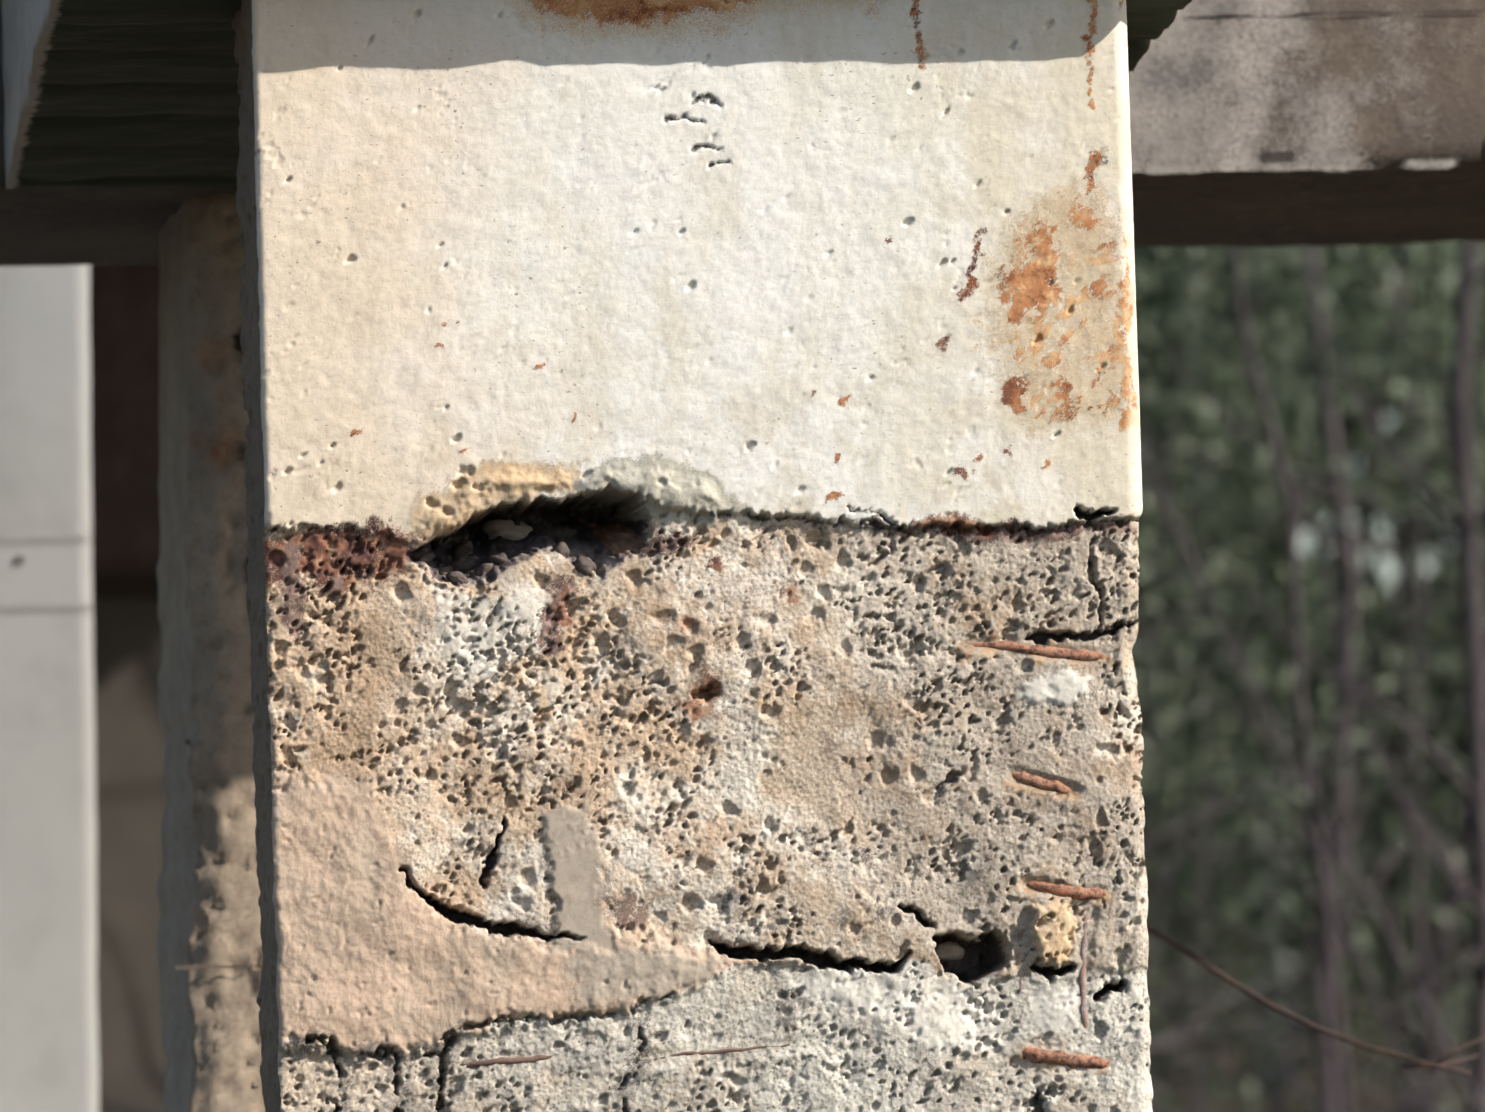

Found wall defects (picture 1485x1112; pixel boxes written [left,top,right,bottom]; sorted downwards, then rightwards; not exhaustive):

rust [491,0,930,72]
rust [1080,0,1099,110]
crack [663,94,730,167]
rust [935,146,1139,469]
rust [952,453,983,481]
rust [262,514,430,642]
crack [1025,506,1136,645]
rust [957,630,1115,670]
spalling [263,488,1153,1112]
crack [398,817,577,942]
crack [709,903,936,974]
crack [282,993,672,1112]